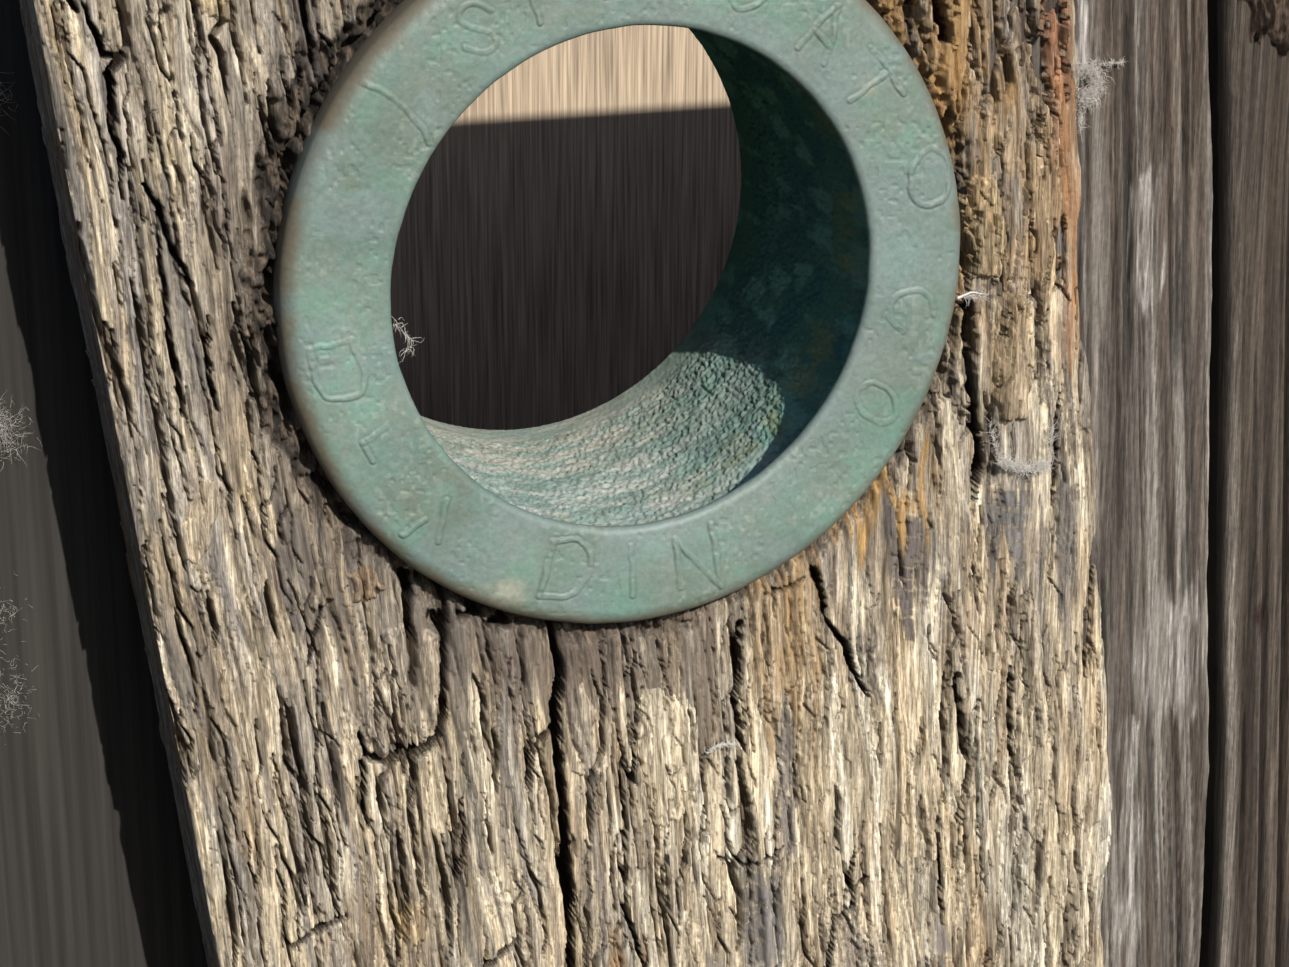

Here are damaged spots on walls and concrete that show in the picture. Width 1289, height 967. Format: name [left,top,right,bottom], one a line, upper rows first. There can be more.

crack [66,0,217,416]
crack [357,567,511,826]
crack [729,619,743,742]
crack [763,564,867,696]
crack [451,799,466,875]
crack [523,620,575,967]
crack [483,937,514,967]